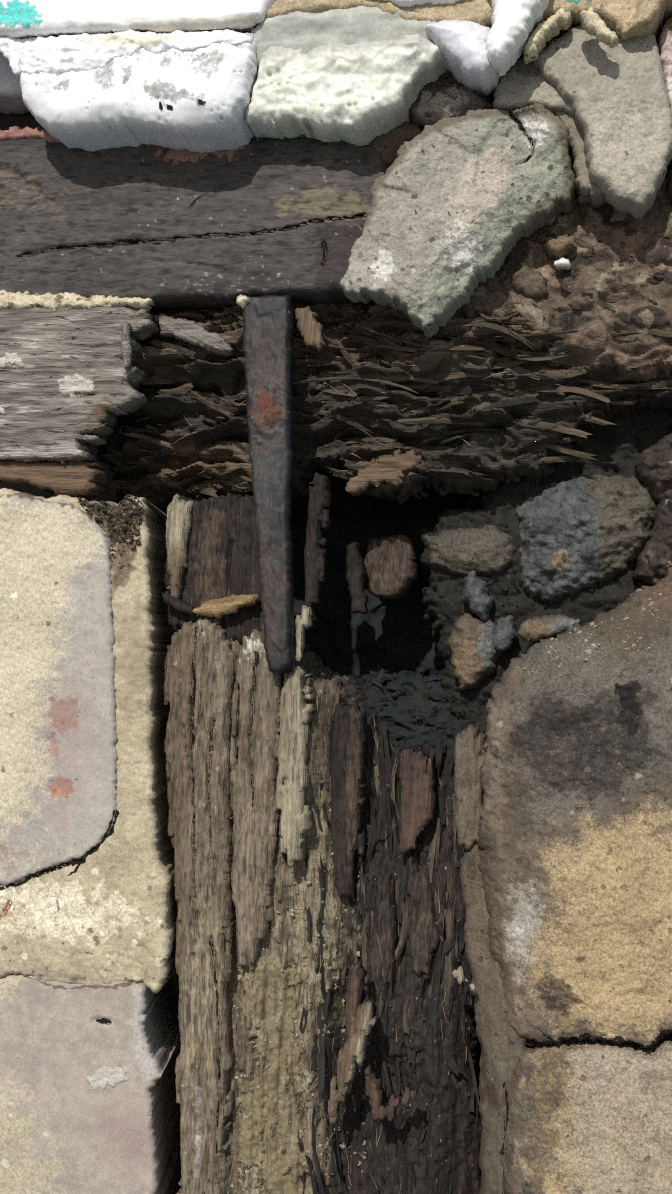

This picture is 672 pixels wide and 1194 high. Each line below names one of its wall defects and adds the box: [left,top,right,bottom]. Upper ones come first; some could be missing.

crack [508,110,535,165]
crack [17,212,367,266]
crack [525,1027,672,1055]